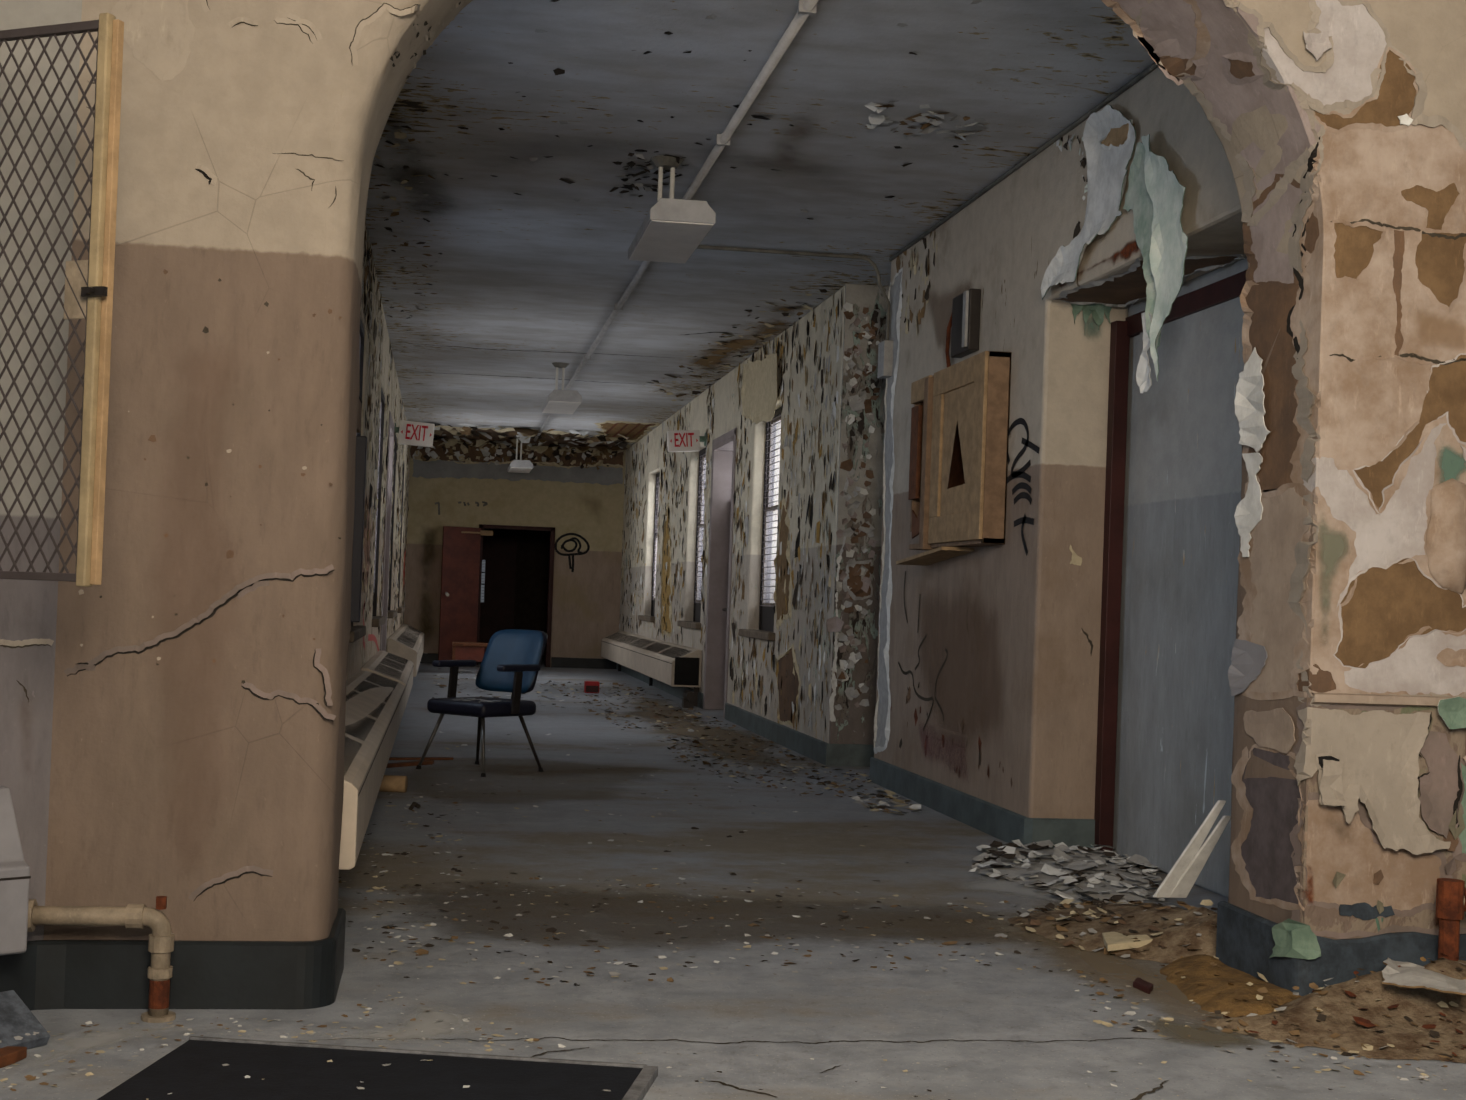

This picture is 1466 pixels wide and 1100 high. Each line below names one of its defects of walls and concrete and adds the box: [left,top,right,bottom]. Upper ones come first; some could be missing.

crack [200,0,420,66]
peeling [864,100,988,167]
peeling [361,111,1012,788]
crack [0,564,334,702]
crack [242,648,336,721]
crack [189,866,274,901]
rust [148,979,170,1009]
crack [1130,1080,1169,1100]